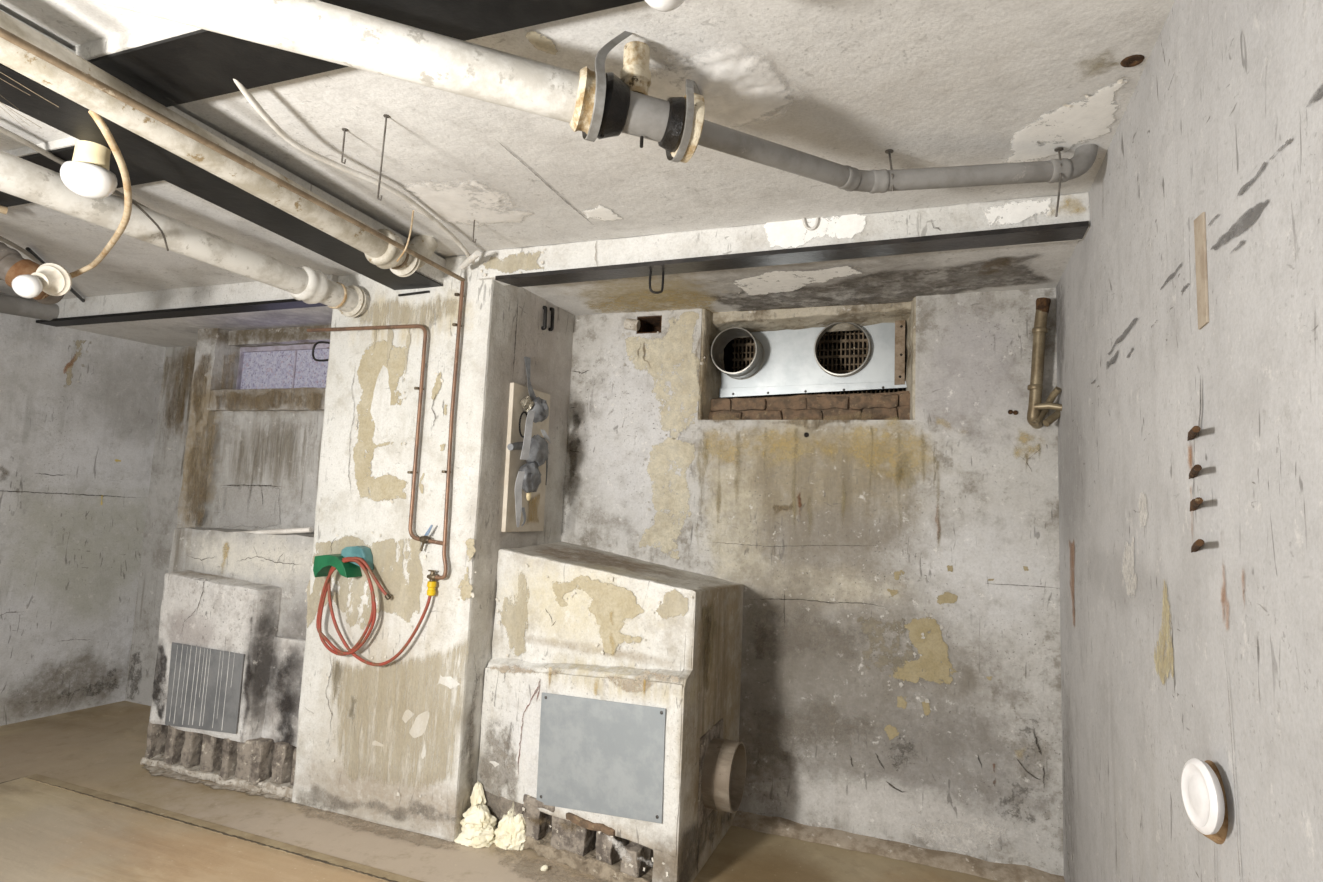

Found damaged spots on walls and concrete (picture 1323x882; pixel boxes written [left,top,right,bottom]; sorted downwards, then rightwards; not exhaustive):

peeling [1003,54,1144,163]
leakage [164,355,235,524]
peeling [353,340,424,503]
peeling [431,372,447,415]
peeling [622,309,705,559]
peeling [495,564,530,657]
peeling [546,575,692,655]
peeling [847,570,958,718]